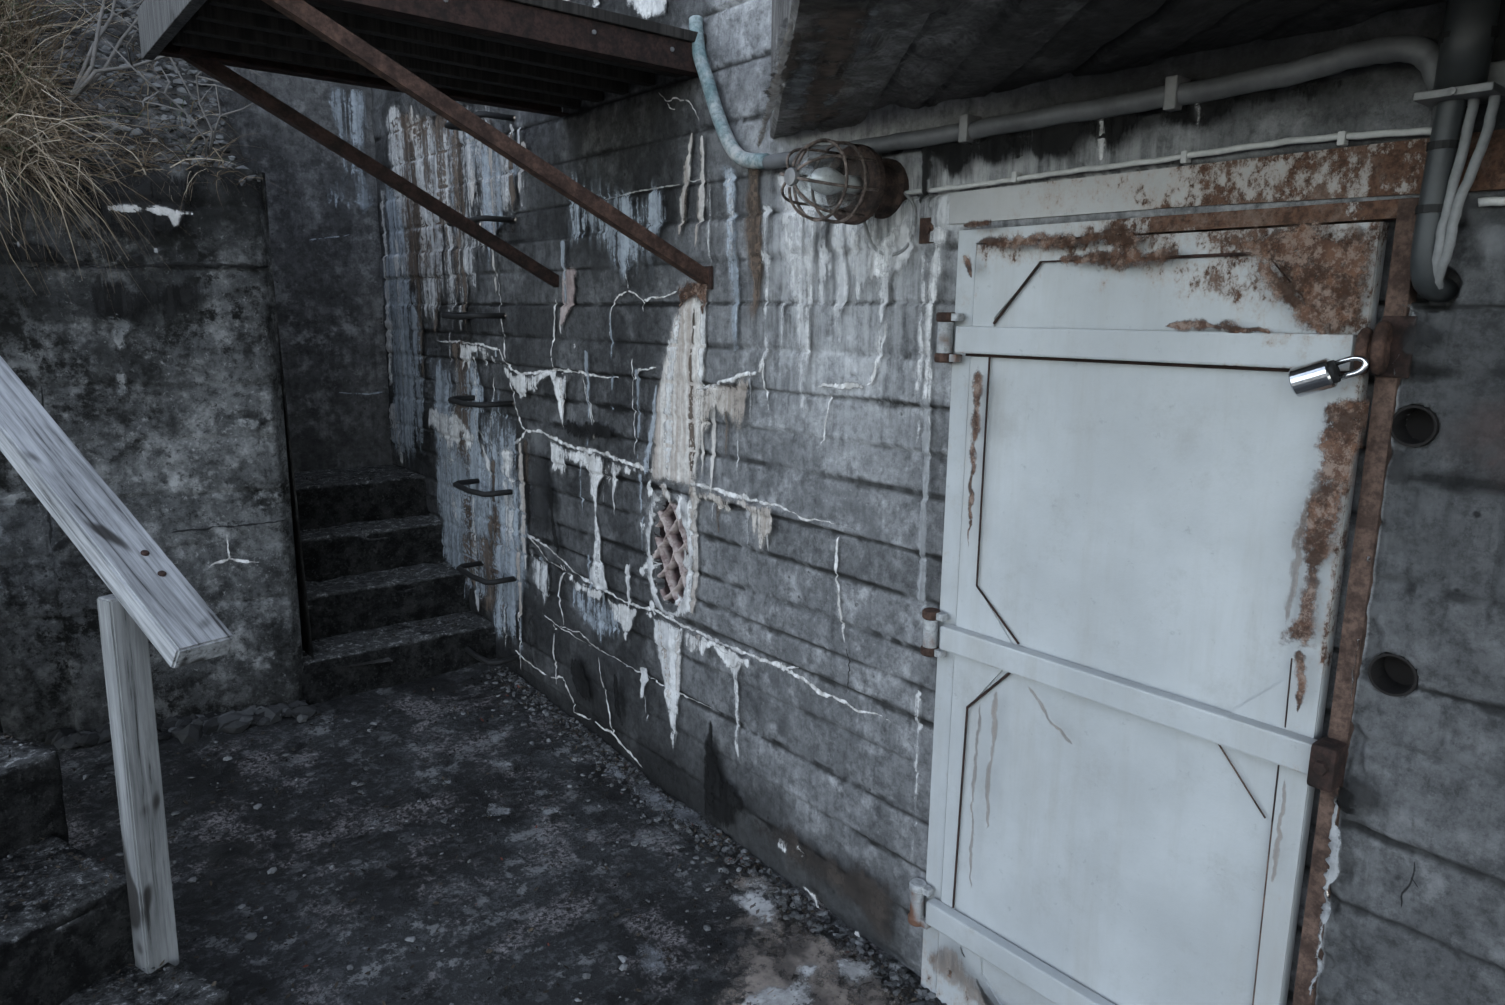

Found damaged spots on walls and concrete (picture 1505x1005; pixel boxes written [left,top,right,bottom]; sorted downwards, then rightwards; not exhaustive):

leakage [761,176,933,454]
rust [963,256,972,277]
rust [964,219,1179,270]
rust [1166,319,1270,334]
rust [1241,220,1376,334]
leakage [386,106,772,756]
rust [967,371,983,546]
spalling [639,480,689,628]
rust [1281,398,1370,712]
leakage [608,721,745,831]
crack [1400,862,1418,907]
rust [929,947,994,1005]